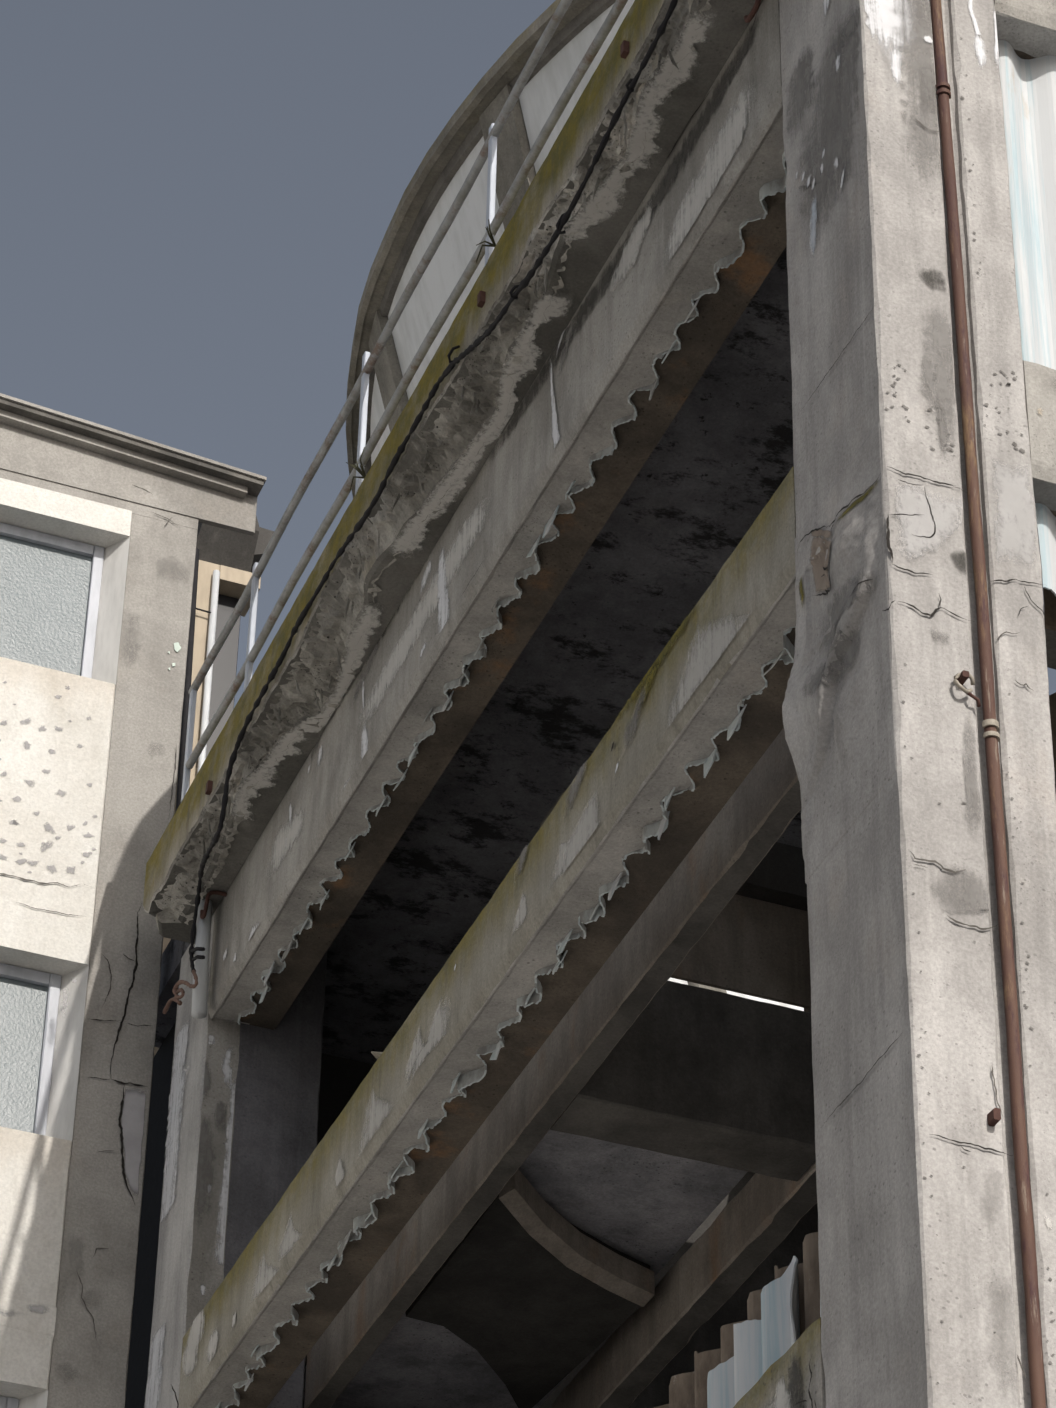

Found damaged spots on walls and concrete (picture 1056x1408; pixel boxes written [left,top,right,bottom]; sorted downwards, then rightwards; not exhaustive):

damp [232,13,755,820]
spalling [152,0,711,925]
crack [797,466,1046,639]
damp [1,703,91,749]
damp [0,749,55,802]
damp [0,812,97,873]
efflorescence [267,803,303,876]
crack [90,904,151,1204]
crack [991,1067,1003,1116]
crack [931,1134,1011,1156]
crack [77,1248,109,1337]